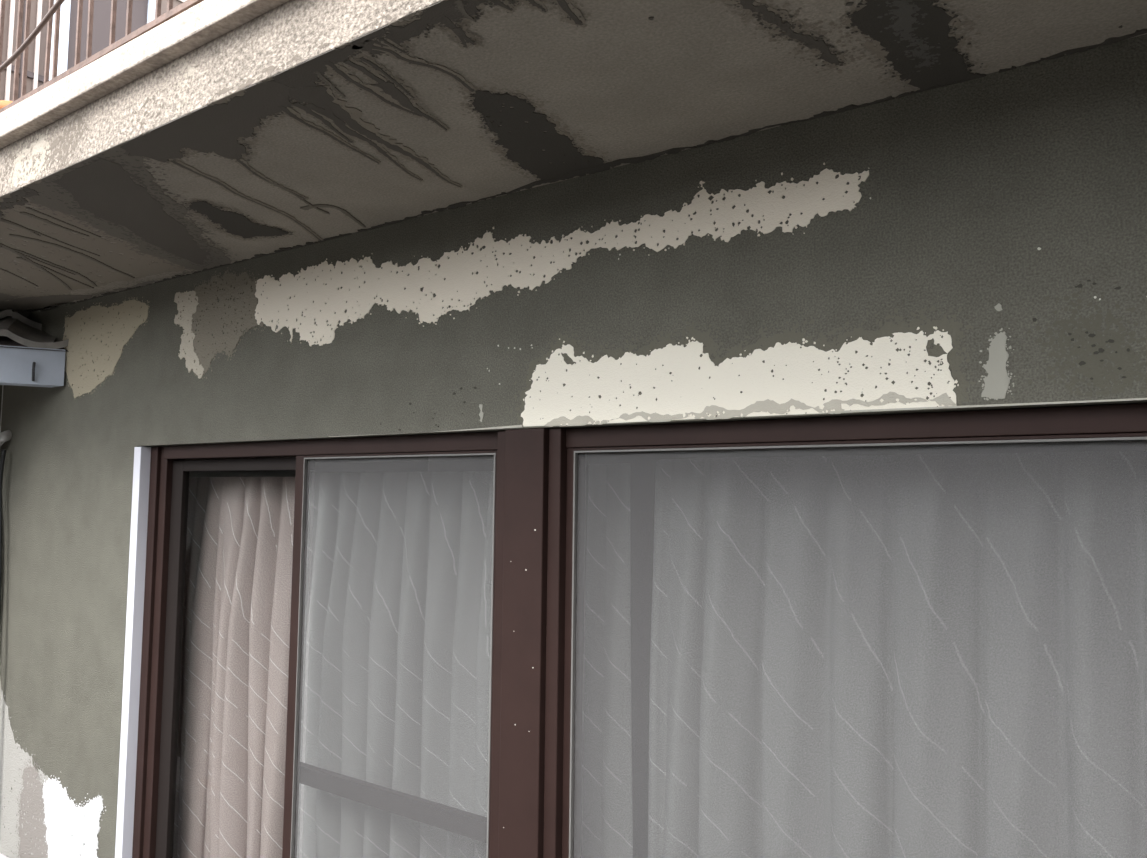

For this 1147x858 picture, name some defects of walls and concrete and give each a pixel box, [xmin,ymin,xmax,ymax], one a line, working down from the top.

water stain [710,0,920,92]
peeling [255,162,869,346]
flaking render [62,297,149,399]
peeling [174,290,204,379]
peeling [0,690,106,858]